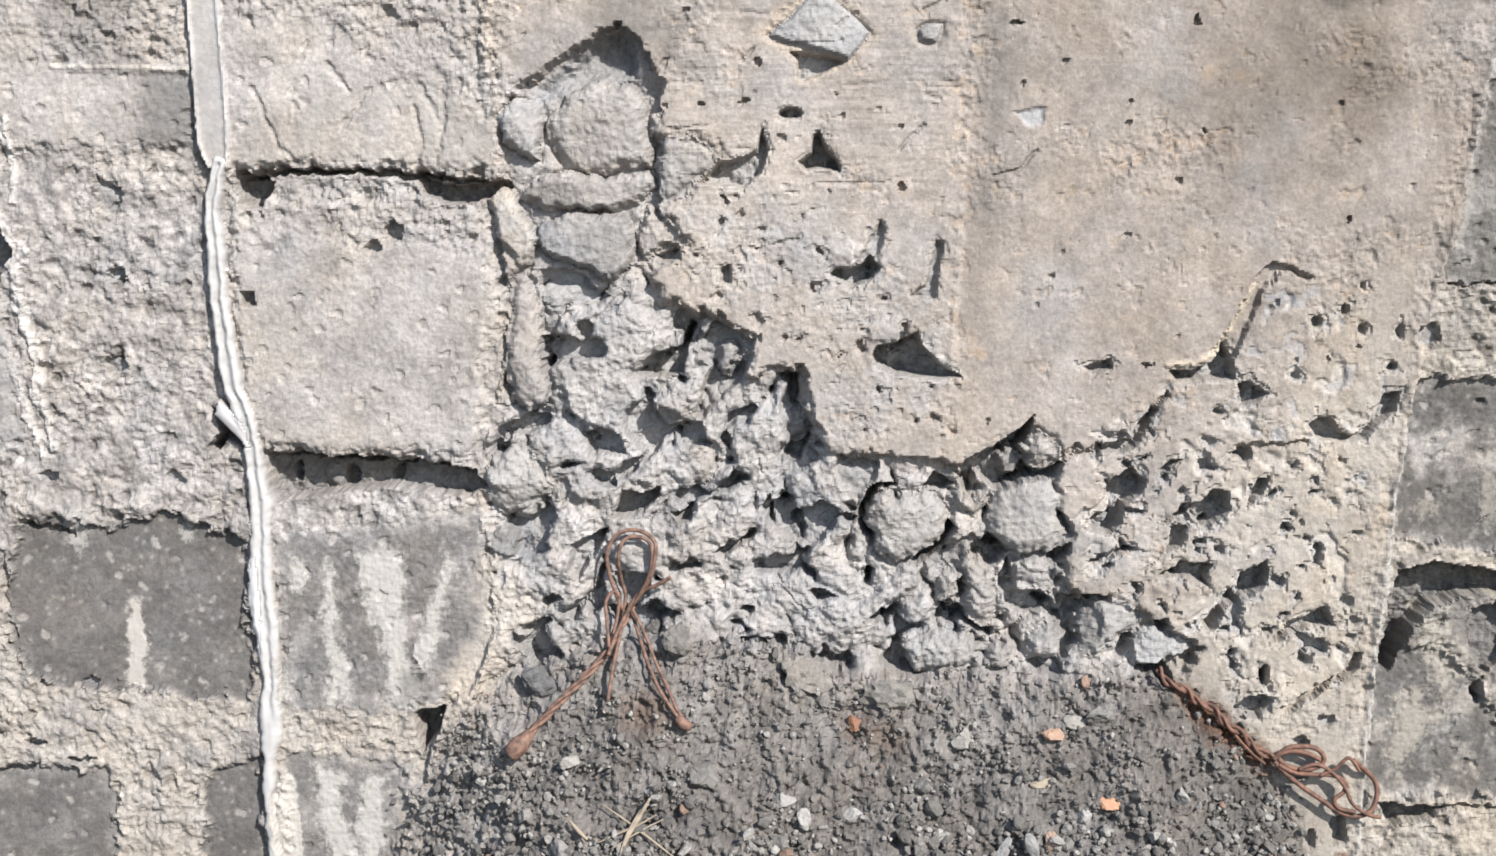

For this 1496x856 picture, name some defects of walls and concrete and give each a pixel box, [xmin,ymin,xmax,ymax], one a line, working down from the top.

spalling [759,0,881,83]
spalling [475,21,1406,728]
crack [185,0,515,856]
rust [1173,688,1277,774]
crack [1377,801,1496,834]